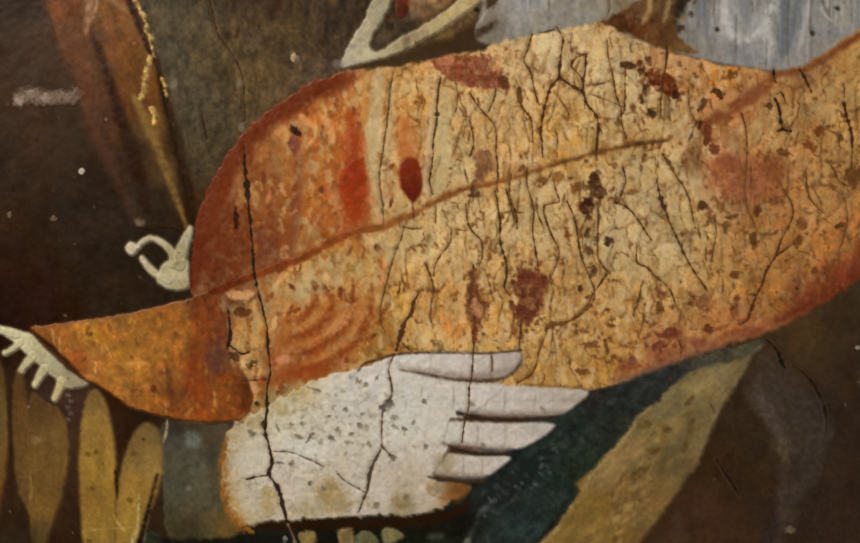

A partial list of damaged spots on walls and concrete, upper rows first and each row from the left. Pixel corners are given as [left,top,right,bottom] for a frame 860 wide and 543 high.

crack [207,0,246,122]
crack [687,88,704,136]
crack [772,68,793,133]
crack [798,67,812,94]
crack [227,0,681,543]
crack [655,153,717,292]
crack [739,82,860,326]
crack [764,337,827,439]